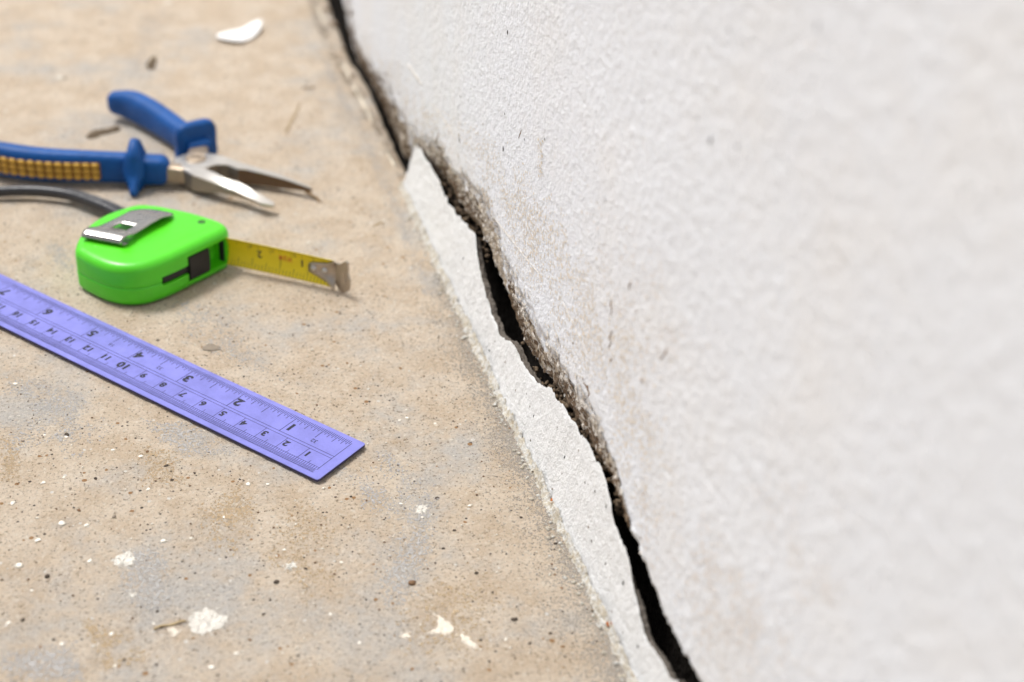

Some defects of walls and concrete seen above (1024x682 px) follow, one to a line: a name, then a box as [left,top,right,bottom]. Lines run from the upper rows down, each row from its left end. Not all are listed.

crack [328,0,410,173]
peeling [353,22,629,515]
crack [435,133,702,682]
spalling [631,570,685,682]